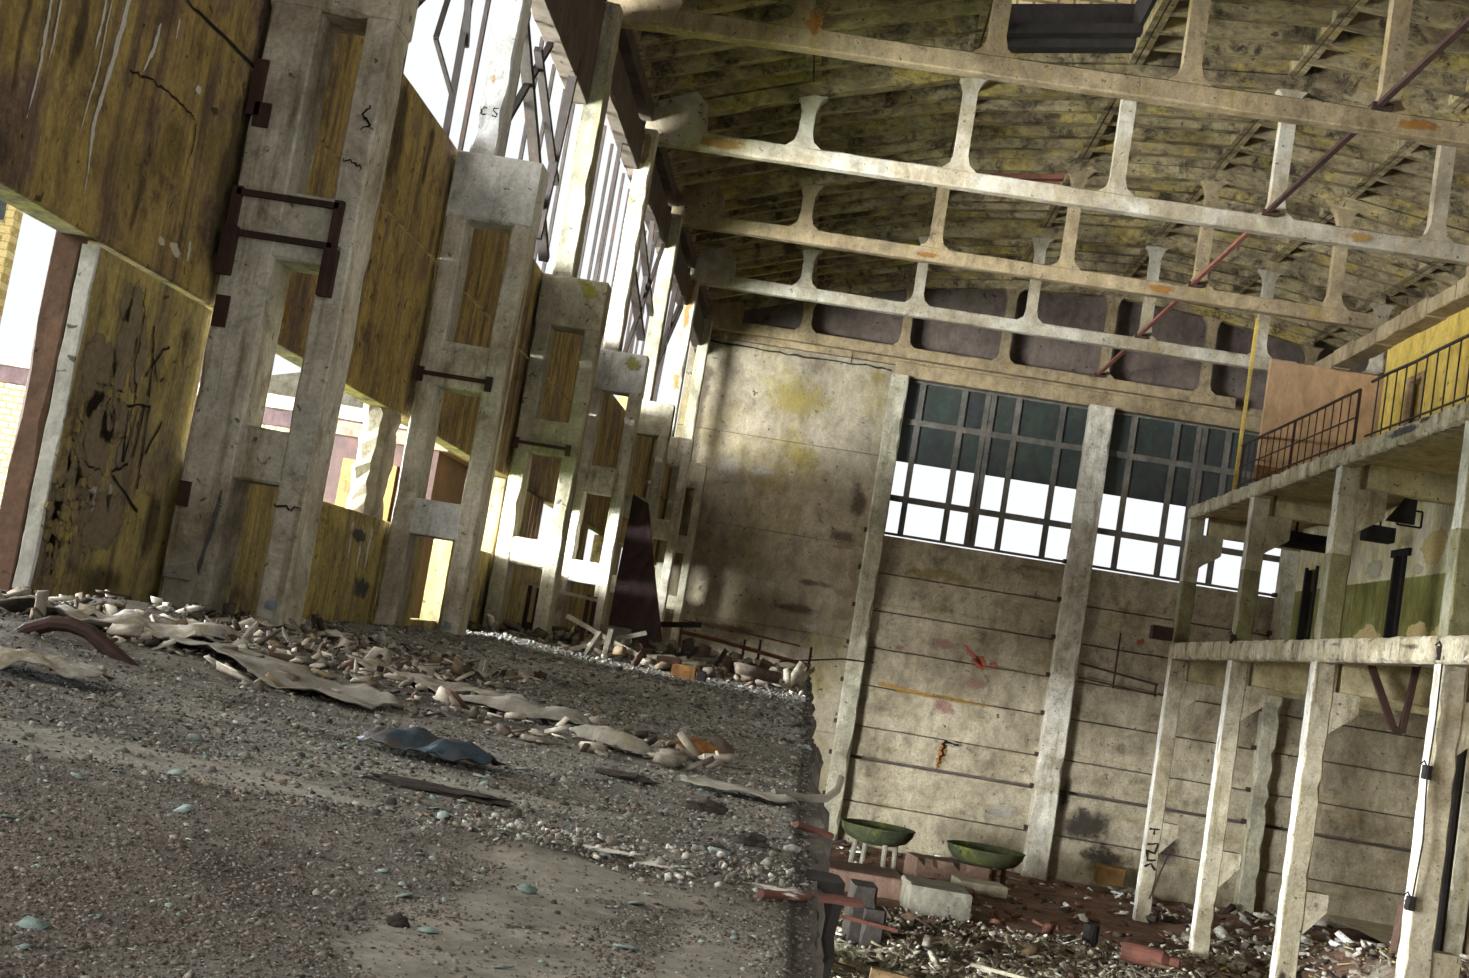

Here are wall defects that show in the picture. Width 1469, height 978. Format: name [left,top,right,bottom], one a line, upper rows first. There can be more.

crack [130,69,196,188]
peeling [32,280,148,597]